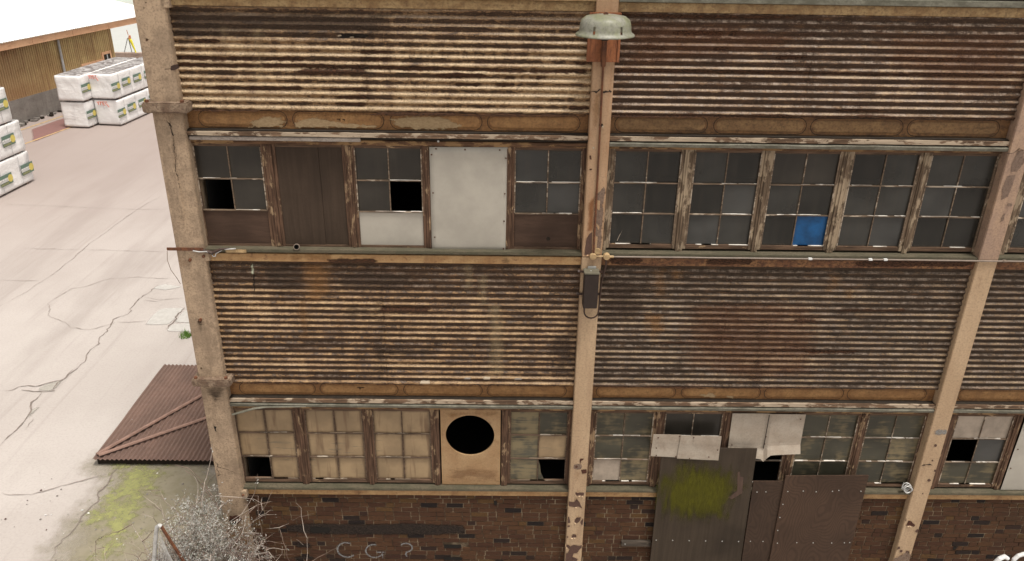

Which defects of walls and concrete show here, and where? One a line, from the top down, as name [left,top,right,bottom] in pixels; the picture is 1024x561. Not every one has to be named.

corrosion [624,13,796,50]
corrosion [177,50,588,88]
corrosion [614,55,1019,77]
corrosion [332,88,589,118]
corrosion [611,109,1015,121]
peeling [1000,150,1024,222]
peeling [585,187,606,256]
peeling [565,492,584,561]